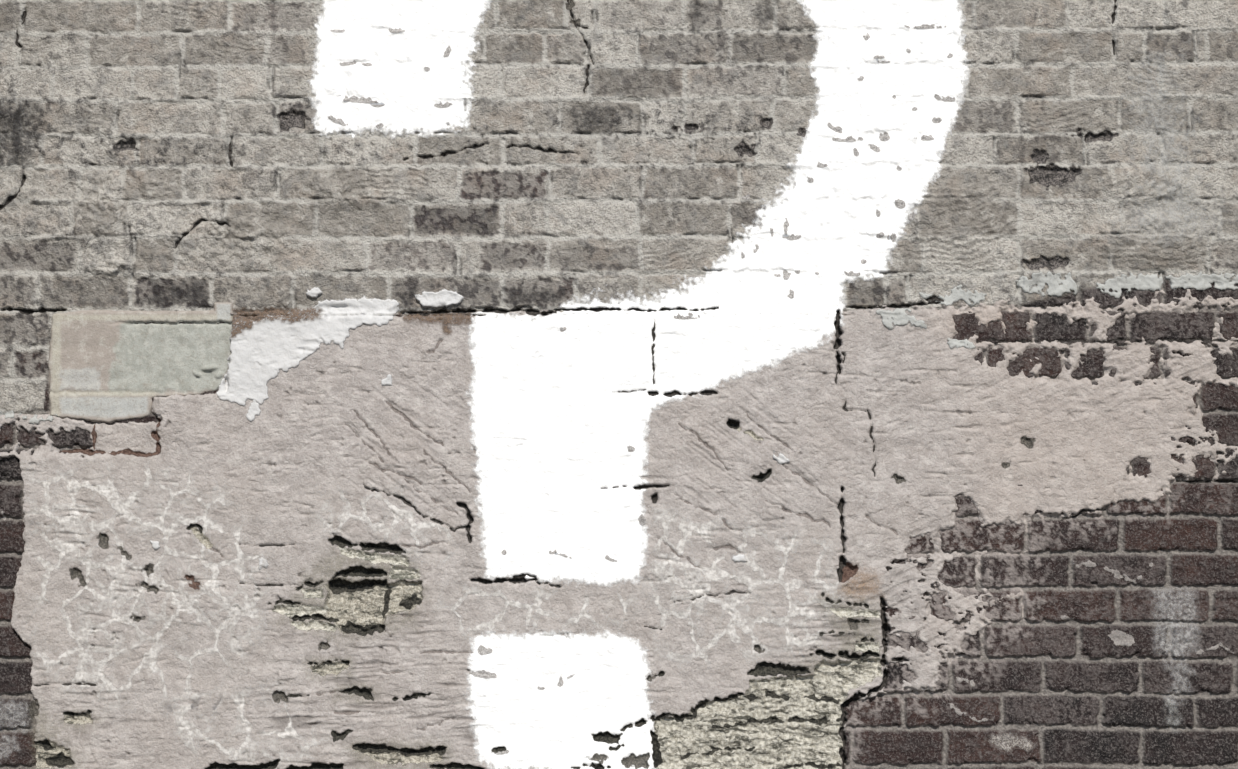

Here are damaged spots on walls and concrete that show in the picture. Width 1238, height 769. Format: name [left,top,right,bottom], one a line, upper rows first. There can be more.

crack [565,0,594,93]
peeling [1016,255,1078,297]
peeling [1096,271,1238,298]
crack [408,307,719,397]
crack [833,296,944,477]
crack [317,484,474,562]
spalling [267,534,423,676]
crack [444,485,859,663]
spalling [338,686,374,701]
spalling [571,592,883,769]
crack [838,597,909,769]
spalling [491,747,509,755]